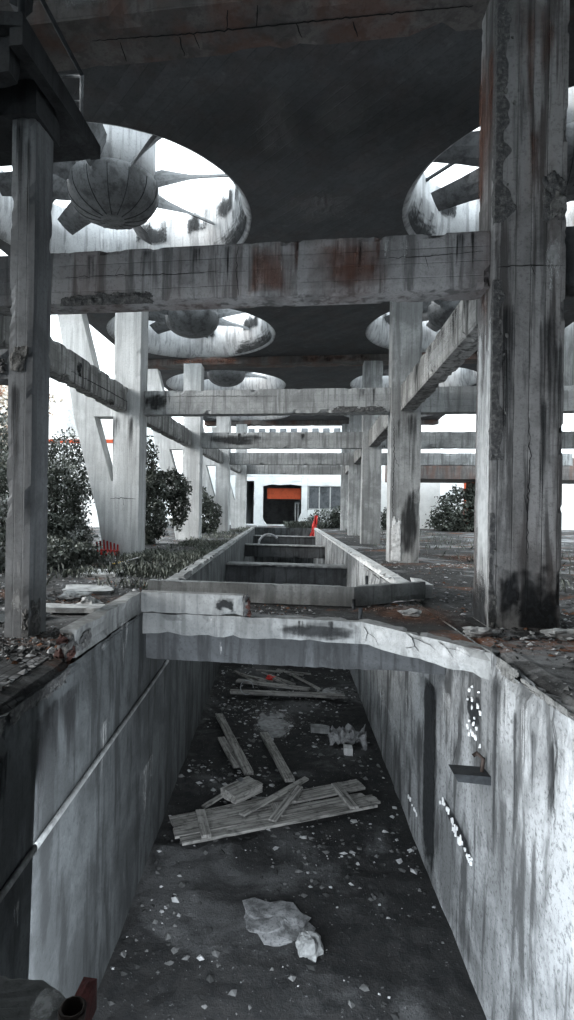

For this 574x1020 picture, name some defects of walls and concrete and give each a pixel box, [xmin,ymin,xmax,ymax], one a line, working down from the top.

spalling [491,0,517,225]
spalling [60,291,154,306]
spalling [0,346,29,373]
water stain [502,309,513,426]
water stain [540,321,562,489]
water stain [401,492,416,552]
water stain [470,328,491,625]
water stain [500,567,557,629]
water stain [493,678,505,798]
spalling [92,662,487,1020]